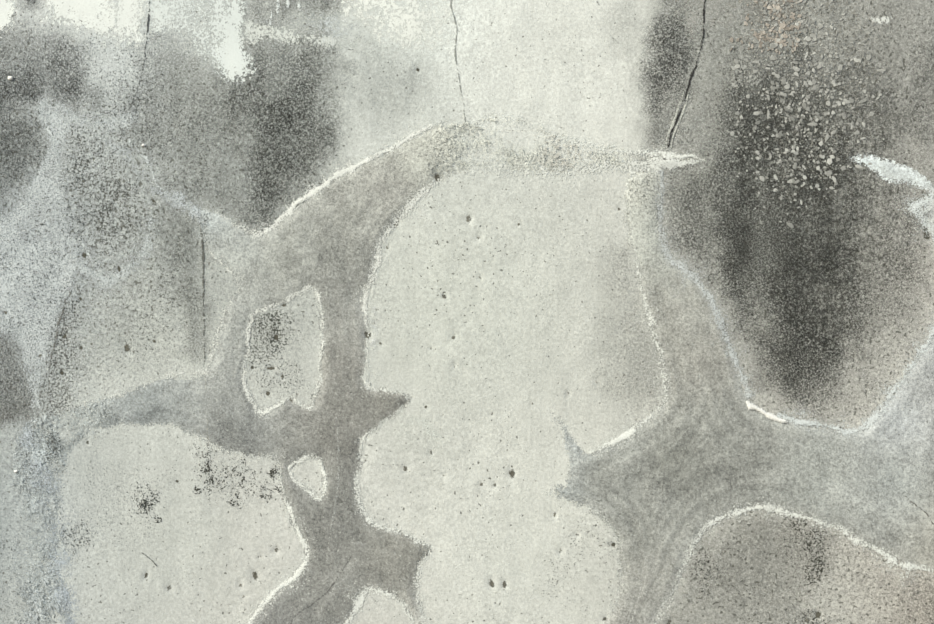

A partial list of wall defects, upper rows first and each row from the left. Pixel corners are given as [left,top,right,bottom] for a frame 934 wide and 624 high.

damp [253,60,322,219]
crack [433,0,478,148]
damp [650,15,690,142]
crack [634,0,706,172]
damp [0,20,217,470]
crack [198,212,207,391]
damp [248,311,304,396]
damp [718,75,859,390]
damp [0,461,176,624]
damp [784,510,830,596]